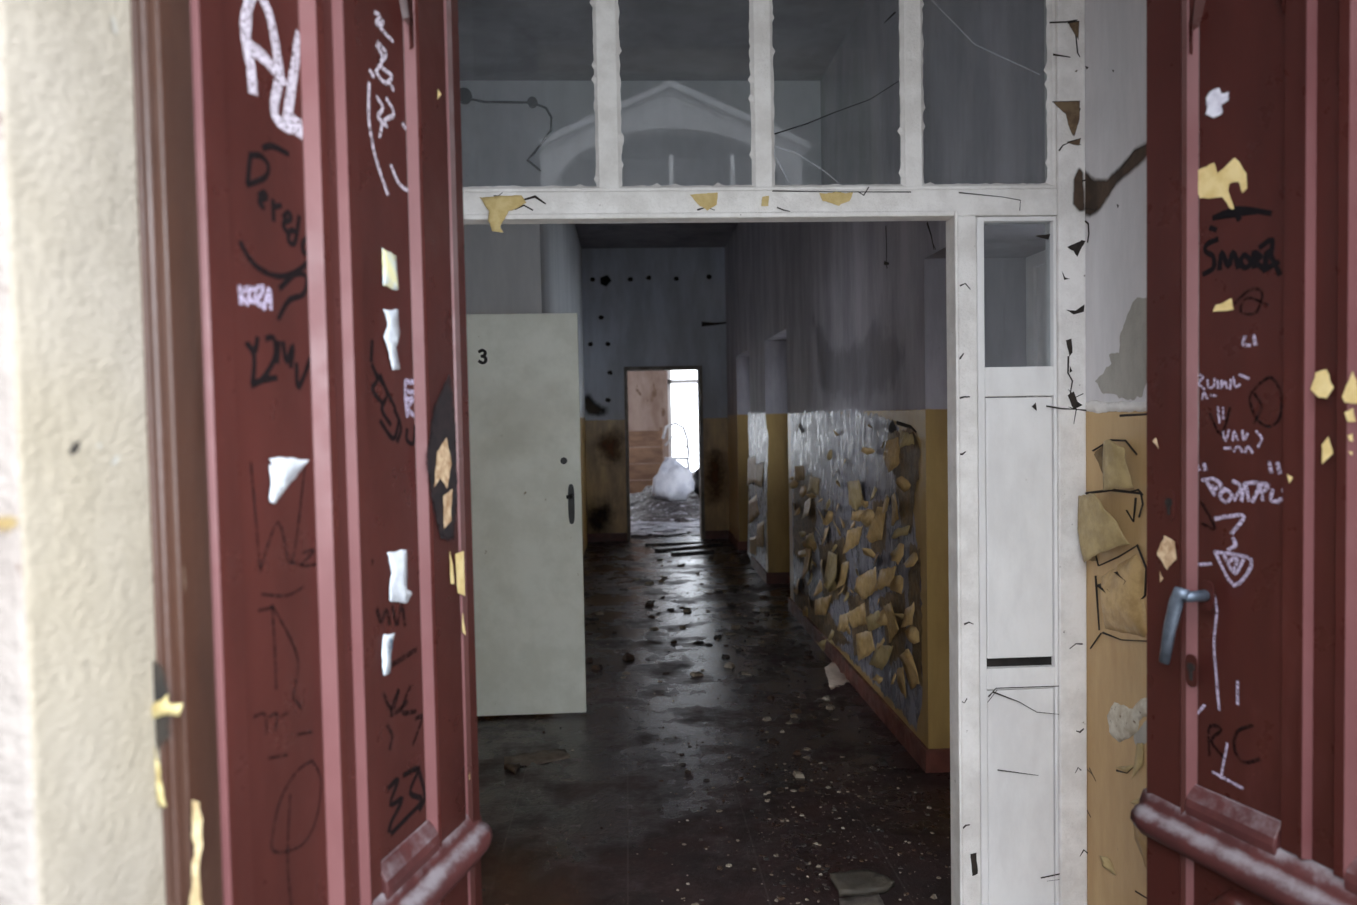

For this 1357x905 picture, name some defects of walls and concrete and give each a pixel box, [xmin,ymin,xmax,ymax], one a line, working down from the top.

spalling [1054,101,1081,145]
peeling [480,195,526,233]
spalling [1068,240,1085,257]
spalling [1068,297,1147,417]
peeling [747,411,768,570]
peeling [789,408,923,732]
spalling [1107,698,1147,779]
peeling [1133,824,1147,869]